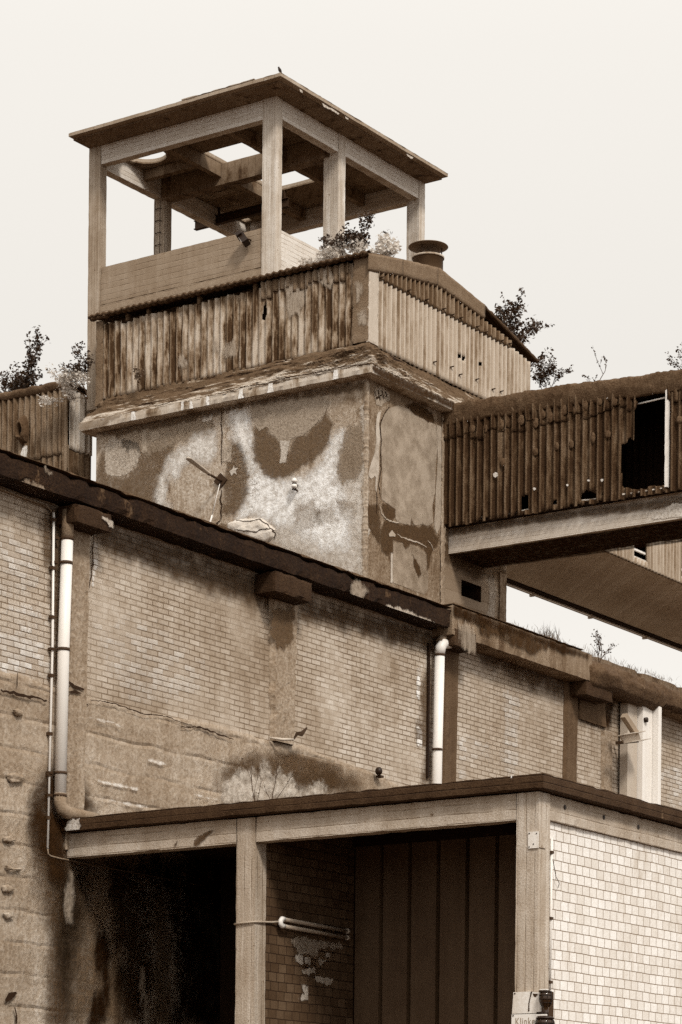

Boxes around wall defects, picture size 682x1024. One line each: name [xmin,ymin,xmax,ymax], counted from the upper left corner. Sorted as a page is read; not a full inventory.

peeling [360,387,442,533]
crack [87,535,95,587]
leakage [79,365,682,694]
peeling [390,542,428,594]
crack [1,673,234,740]
leakage [222,751,358,803]
leakage [31,768,123,1024]
peeling [291,936,342,1001]